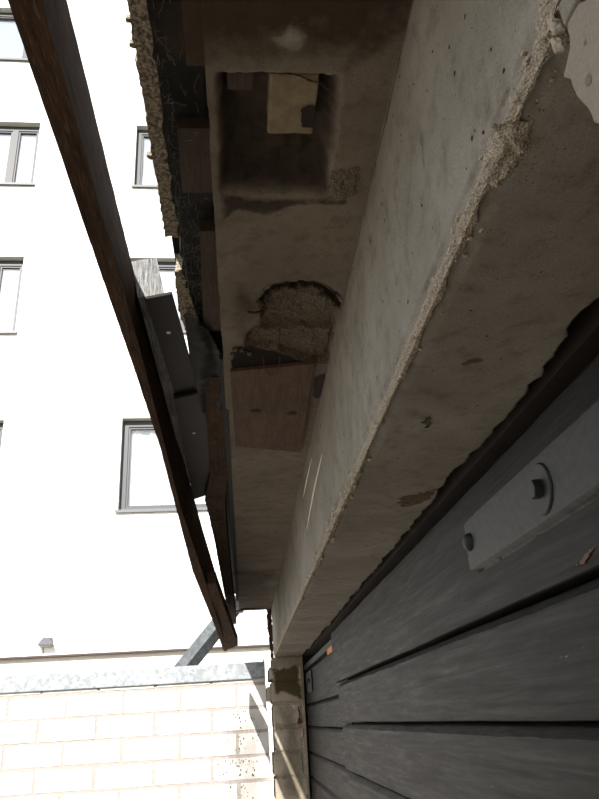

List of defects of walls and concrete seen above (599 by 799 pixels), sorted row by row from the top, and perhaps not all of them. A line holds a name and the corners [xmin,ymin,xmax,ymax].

spalling [230,278,343,377]
spalling [274,0,570,657]